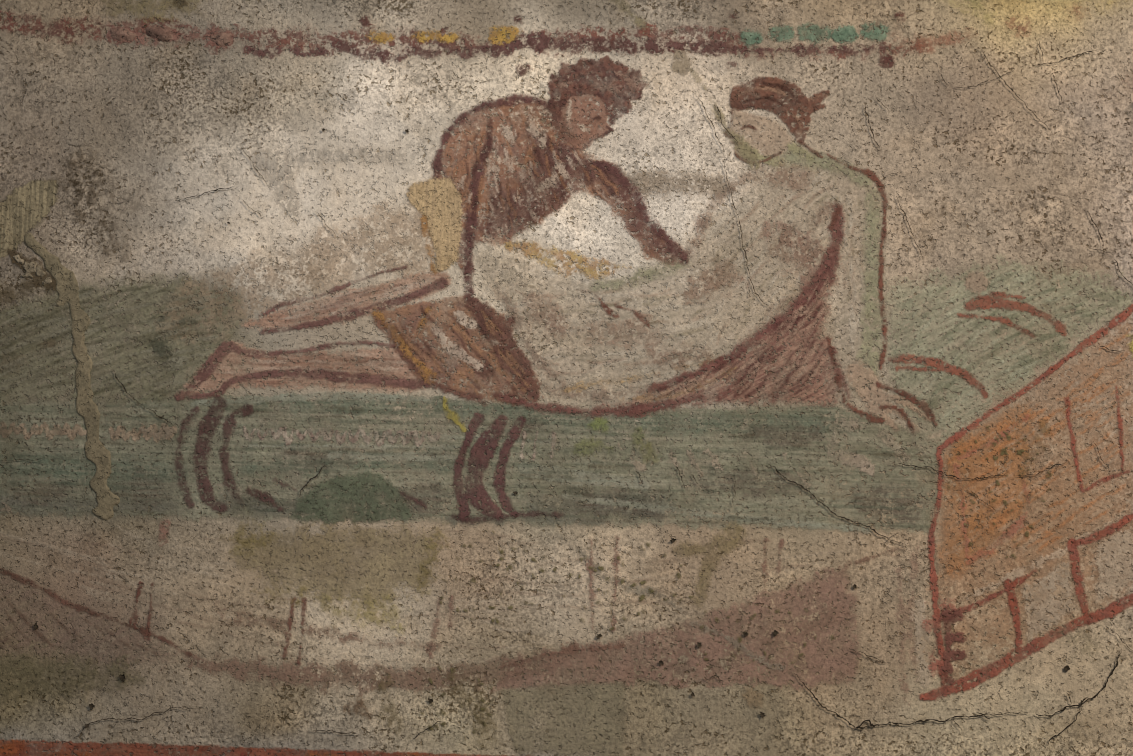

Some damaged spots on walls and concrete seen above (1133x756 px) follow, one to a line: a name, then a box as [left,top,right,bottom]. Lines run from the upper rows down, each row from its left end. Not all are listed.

crack [769,464,906,545]
crack [891,463,1061,513]
crack [708,628,1130,744]